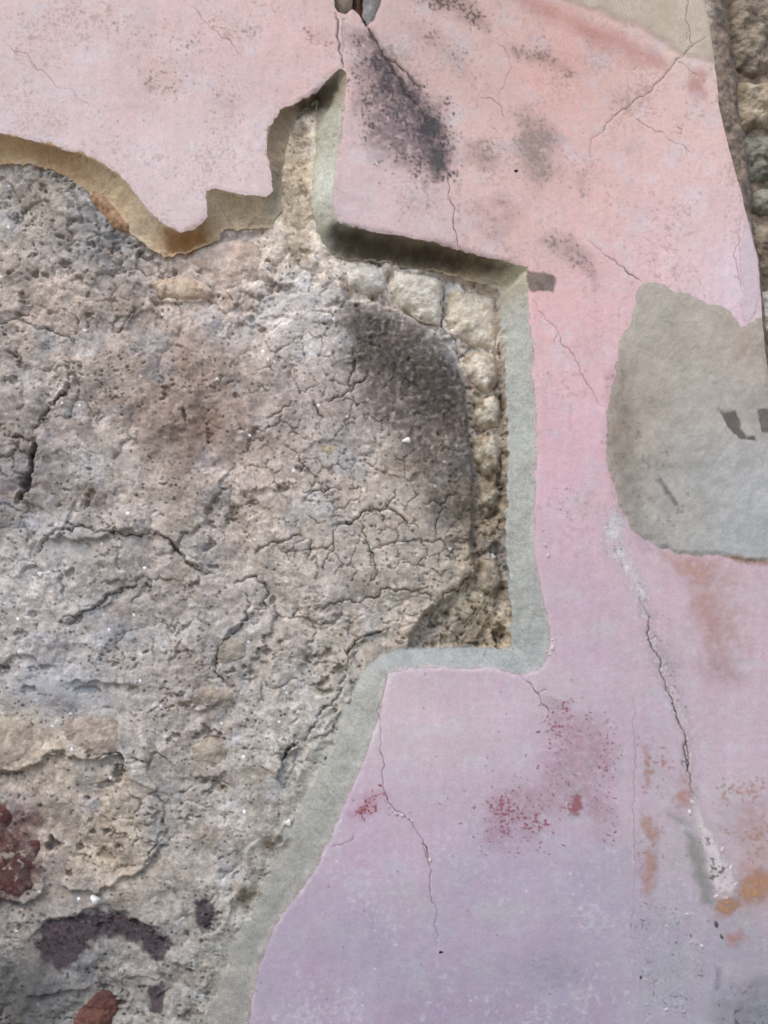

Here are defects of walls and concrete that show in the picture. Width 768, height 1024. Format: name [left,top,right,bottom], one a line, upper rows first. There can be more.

water stain [301,35,457,181]
water stain [244,289,331,339]
crack [272,363,368,418]
water stain [352,318,469,517]
flaking render [600,282,768,620]
crack [65,583,137,625]
crack [41,525,209,574]
flaking render [0,69,555,1024]
crack [215,495,472,687]
crack [642,604,694,796]
peeling [484,774,591,855]
corrosion [715,872,768,913]